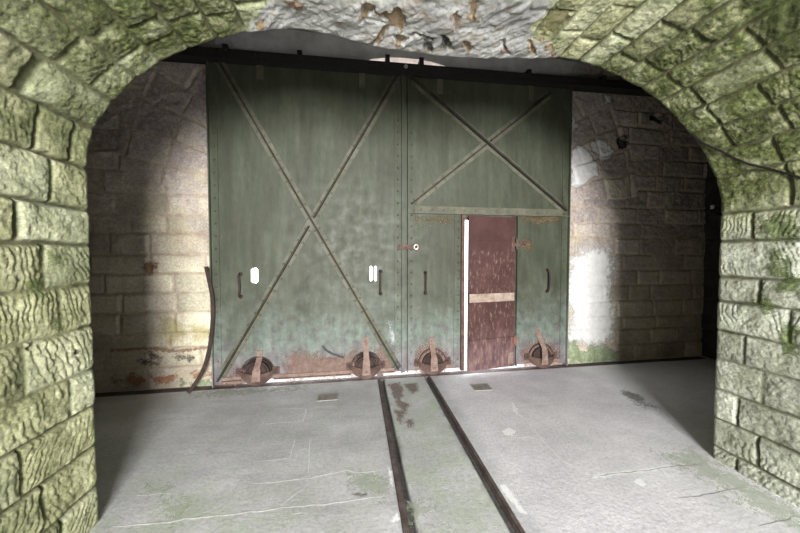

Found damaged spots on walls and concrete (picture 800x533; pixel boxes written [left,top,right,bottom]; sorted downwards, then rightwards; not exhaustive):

flaking render [359,0,479,52]
peeling [571,135,630,187]
corrosion [143,261,159,274]
corrosion [113,370,212,385]
corrosion [375,348,419,428]
leakage [568,340,619,364]
crack [511,399,700,477]